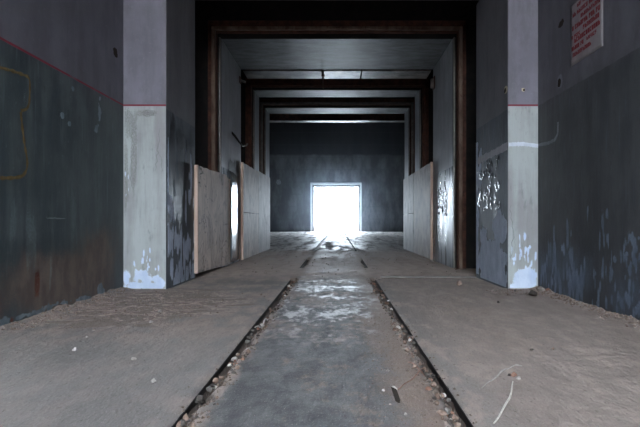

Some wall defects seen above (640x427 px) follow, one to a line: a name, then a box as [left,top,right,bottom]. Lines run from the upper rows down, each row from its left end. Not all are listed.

peeling [123,138,195,289]
leakage [167,115,194,228]
peeling [476,142,640,318]